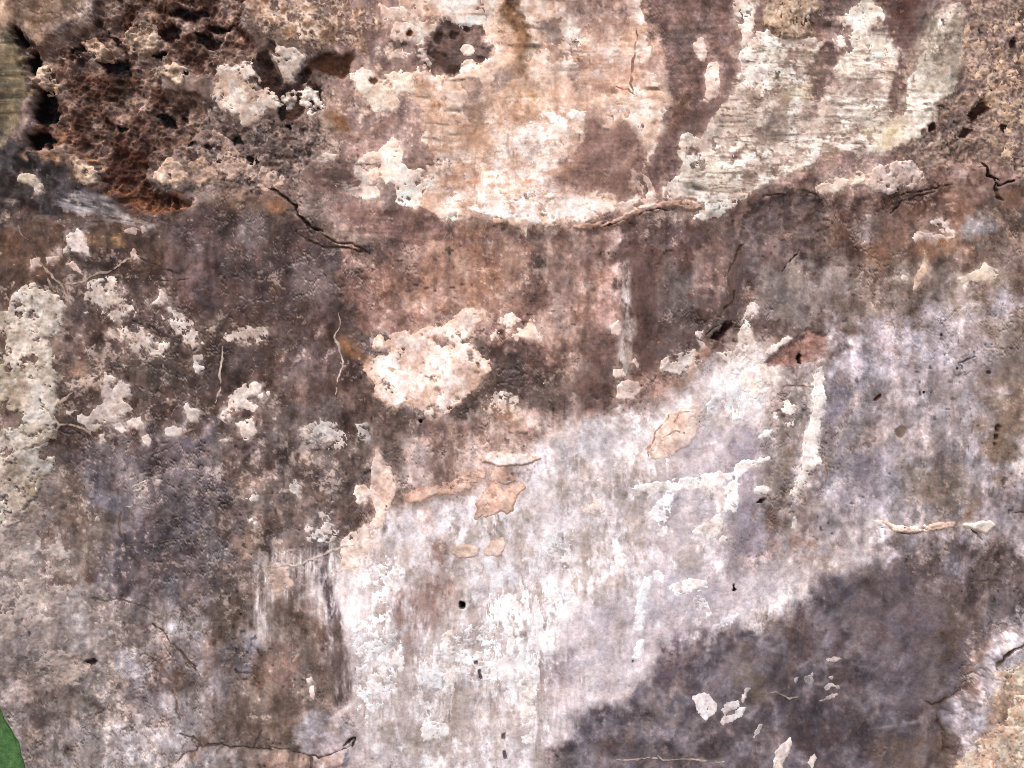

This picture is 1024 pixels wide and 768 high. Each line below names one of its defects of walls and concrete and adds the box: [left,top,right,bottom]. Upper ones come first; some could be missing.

corrosion [57,64,145,105]
corrosion [16,123,297,222]
crack [269,188,370,254]
spalling [9,0,1024,247]
damp [531,0,969,211]
crack [888,184,953,214]
crack [981,162,1016,200]
flaking render [363,308,491,418]
flaking render [0,228,270,687]
flaking render [304,418,541,725]
damp [222,222,974,768]
crack [90,597,357,768]